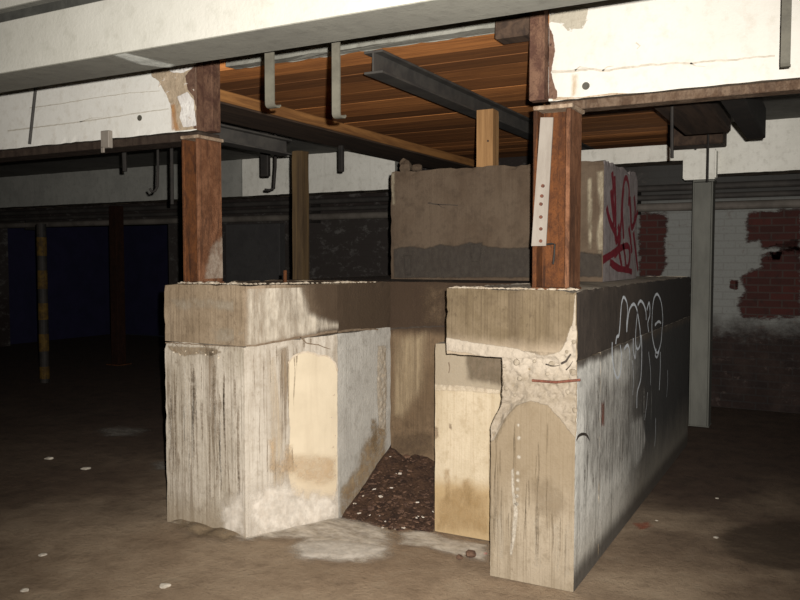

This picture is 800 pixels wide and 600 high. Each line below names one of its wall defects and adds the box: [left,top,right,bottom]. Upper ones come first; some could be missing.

peeling [151,63,197,131]
peeling [548,7,628,101]
crack [552,42,775,73]
water stain [394,242,532,278]
water stain [580,172,604,277]
peeling [638,212,668,277]
peeling [729,208,800,319]
spalling [446,295,581,441]
water stain [272,349,288,485]